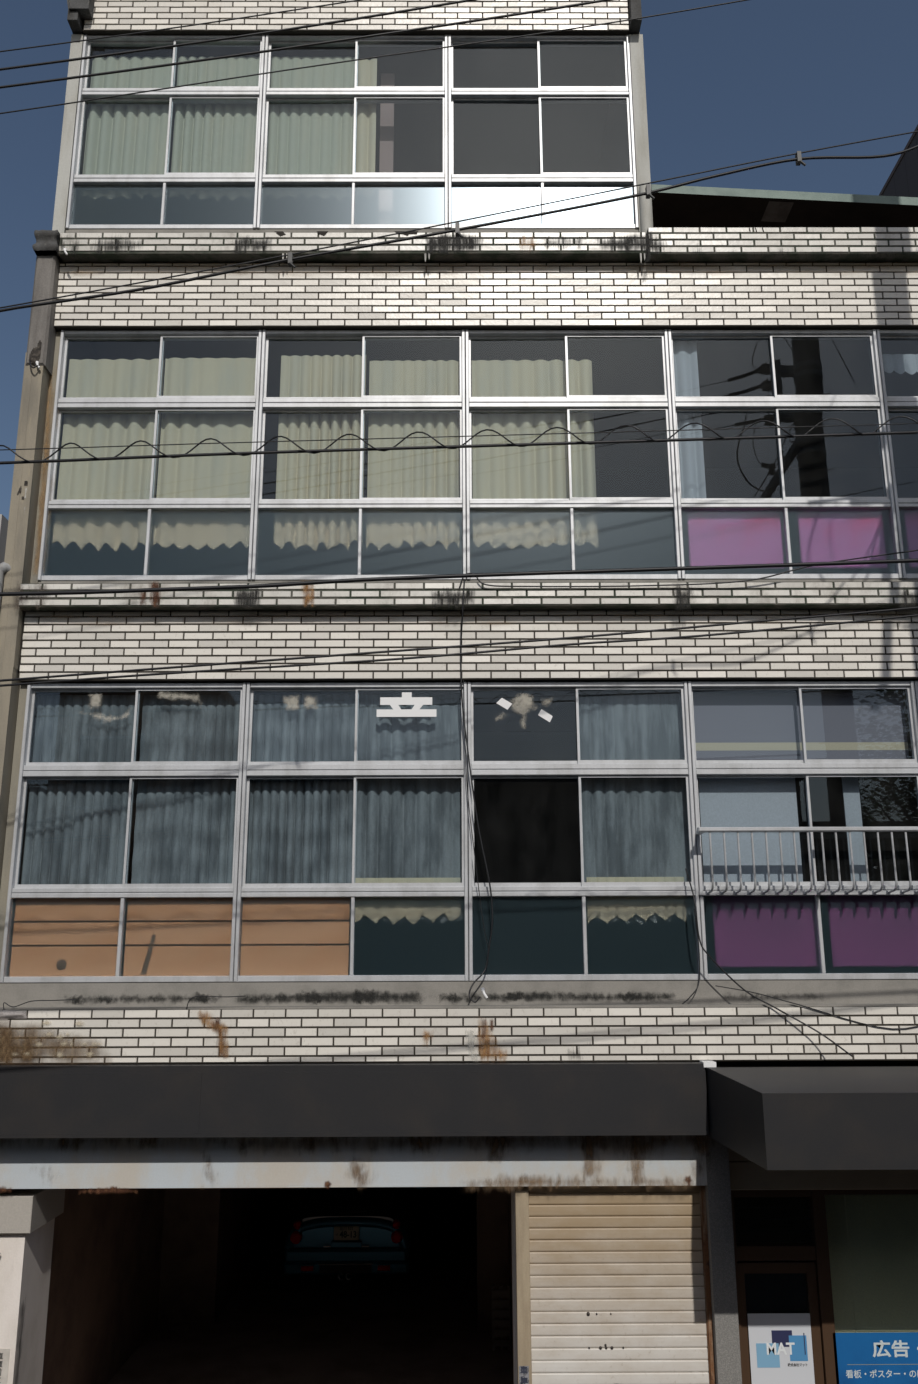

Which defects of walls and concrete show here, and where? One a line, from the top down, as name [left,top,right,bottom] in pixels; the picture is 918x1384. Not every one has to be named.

water stain [426,234,478,253]
water stain [601,233,664,261]
rust [140,583,159,606]
rust [202,1014,227,1055]
rust [479,1020,504,1058]